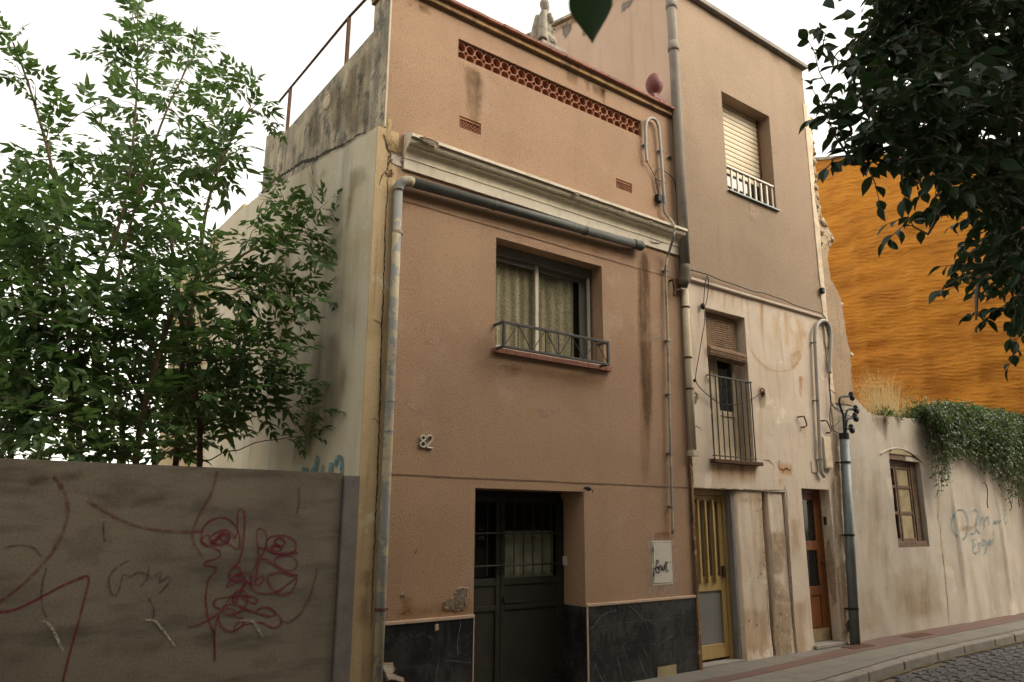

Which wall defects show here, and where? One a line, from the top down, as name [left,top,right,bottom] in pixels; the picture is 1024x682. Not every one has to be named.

crack [258,132,401,623]
spalling [443,587,469,613]